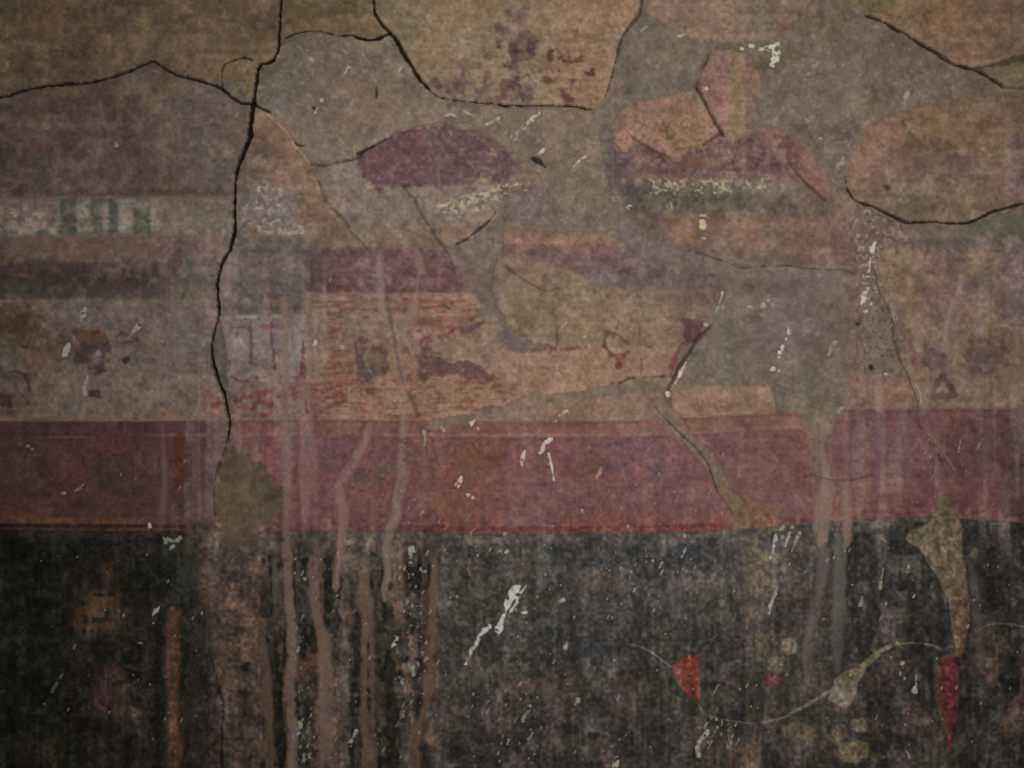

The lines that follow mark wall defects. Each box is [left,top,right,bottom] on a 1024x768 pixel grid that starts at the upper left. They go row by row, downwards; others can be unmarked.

crack [864,14,1024,90]
crack [0,0,643,533]
crack [790,165,1024,225]
water stain [199,247,434,768]
water stain [409,555,440,768]